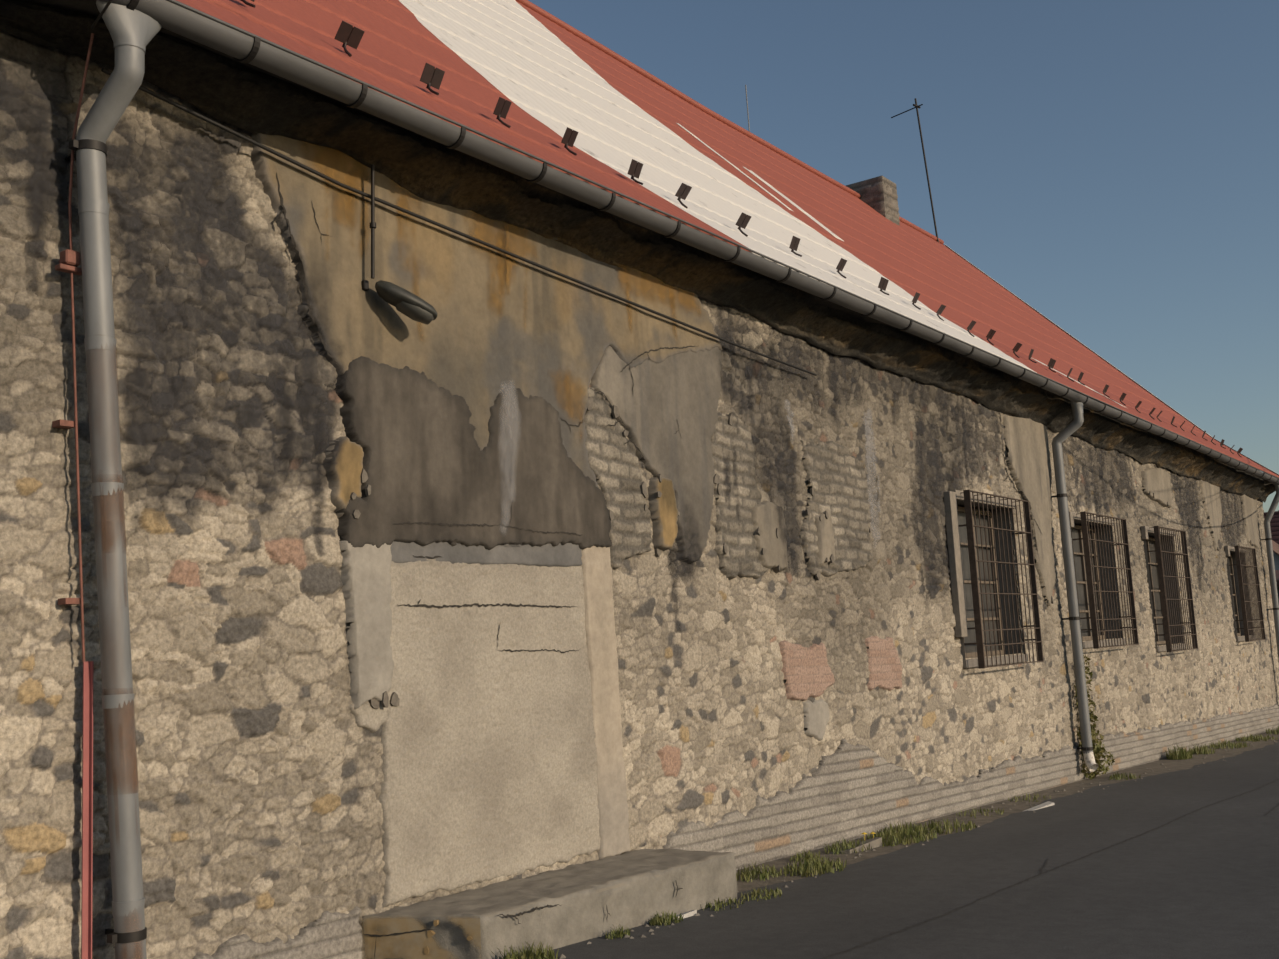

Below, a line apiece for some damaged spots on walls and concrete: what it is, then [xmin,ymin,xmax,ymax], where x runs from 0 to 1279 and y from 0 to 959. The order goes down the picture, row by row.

water stain [106,122,342,552]
flaking render [323,437,371,519]
crack [560,346,695,468]
spalling [583,387,680,569]
water stain [719,309,1000,592]
water stain [1062,435,1135,517]
water stain [1171,470,1203,586]
water stain [1221,491,1244,546]